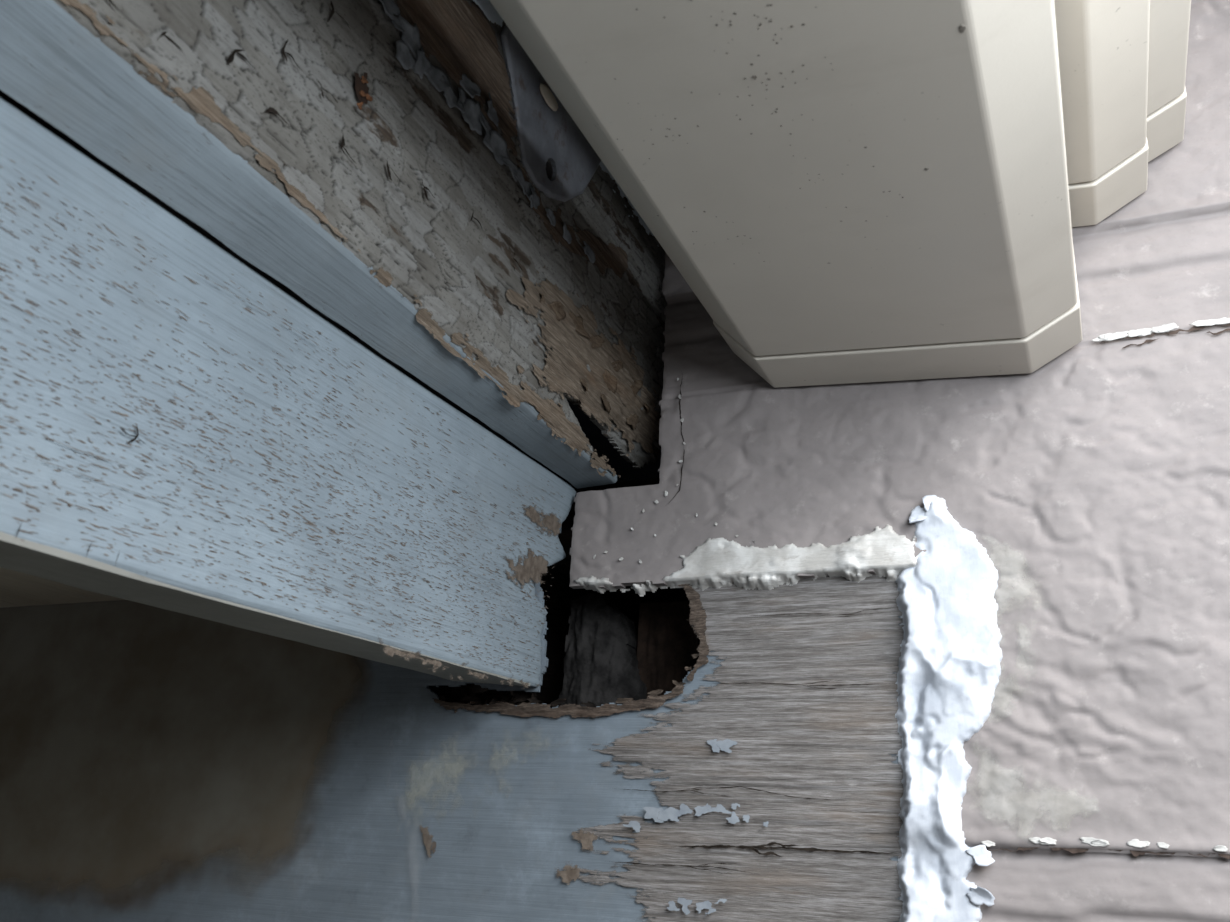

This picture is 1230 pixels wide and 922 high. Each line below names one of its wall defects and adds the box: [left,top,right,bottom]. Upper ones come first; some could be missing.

peeling [379,0,628,279]
leakage [0,600,364,896]
peeling [384,646,539,688]
peeling [506,548,548,588]
peeling [524,505,562,536]
peeling [556,574,904,922]